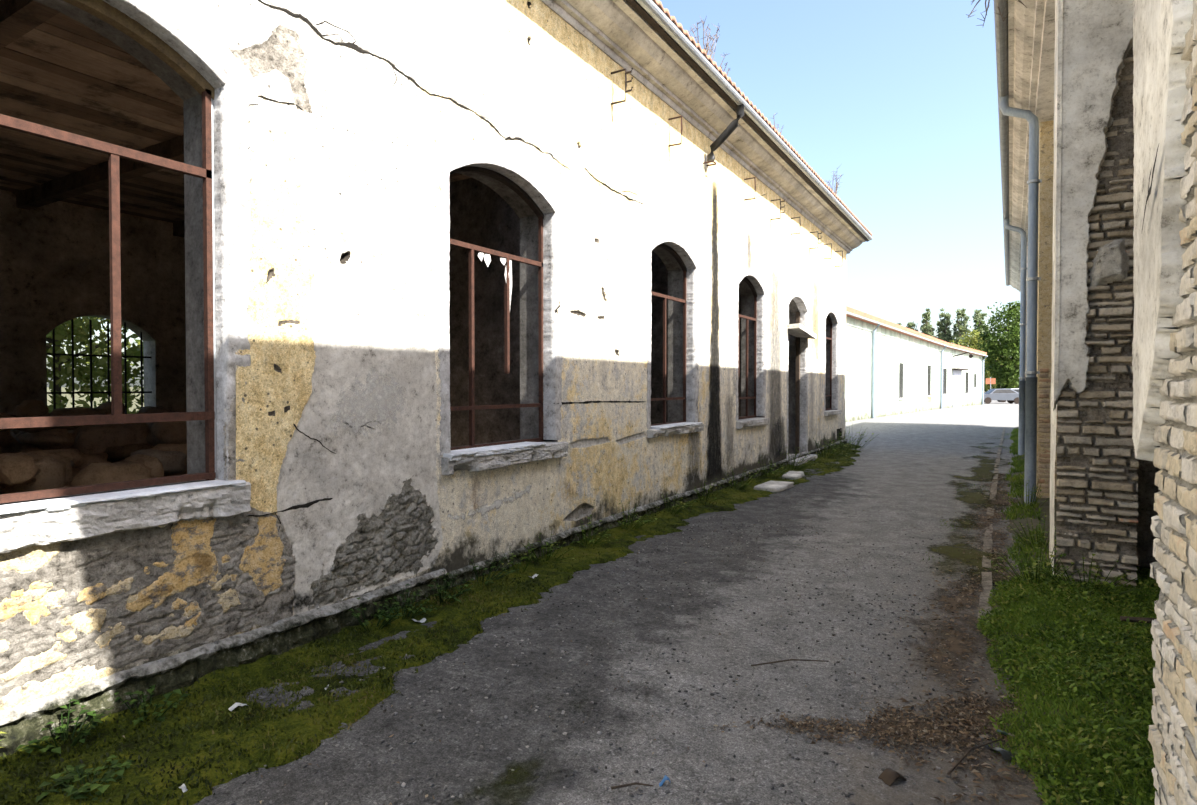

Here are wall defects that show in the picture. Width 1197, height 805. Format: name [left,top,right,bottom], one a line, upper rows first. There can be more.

crack [258,0,644,205]
flaking render [0,215,443,712]
crack [246,498,333,532]
damp [689,186,737,480]
spalling [1038,0,1197,805]